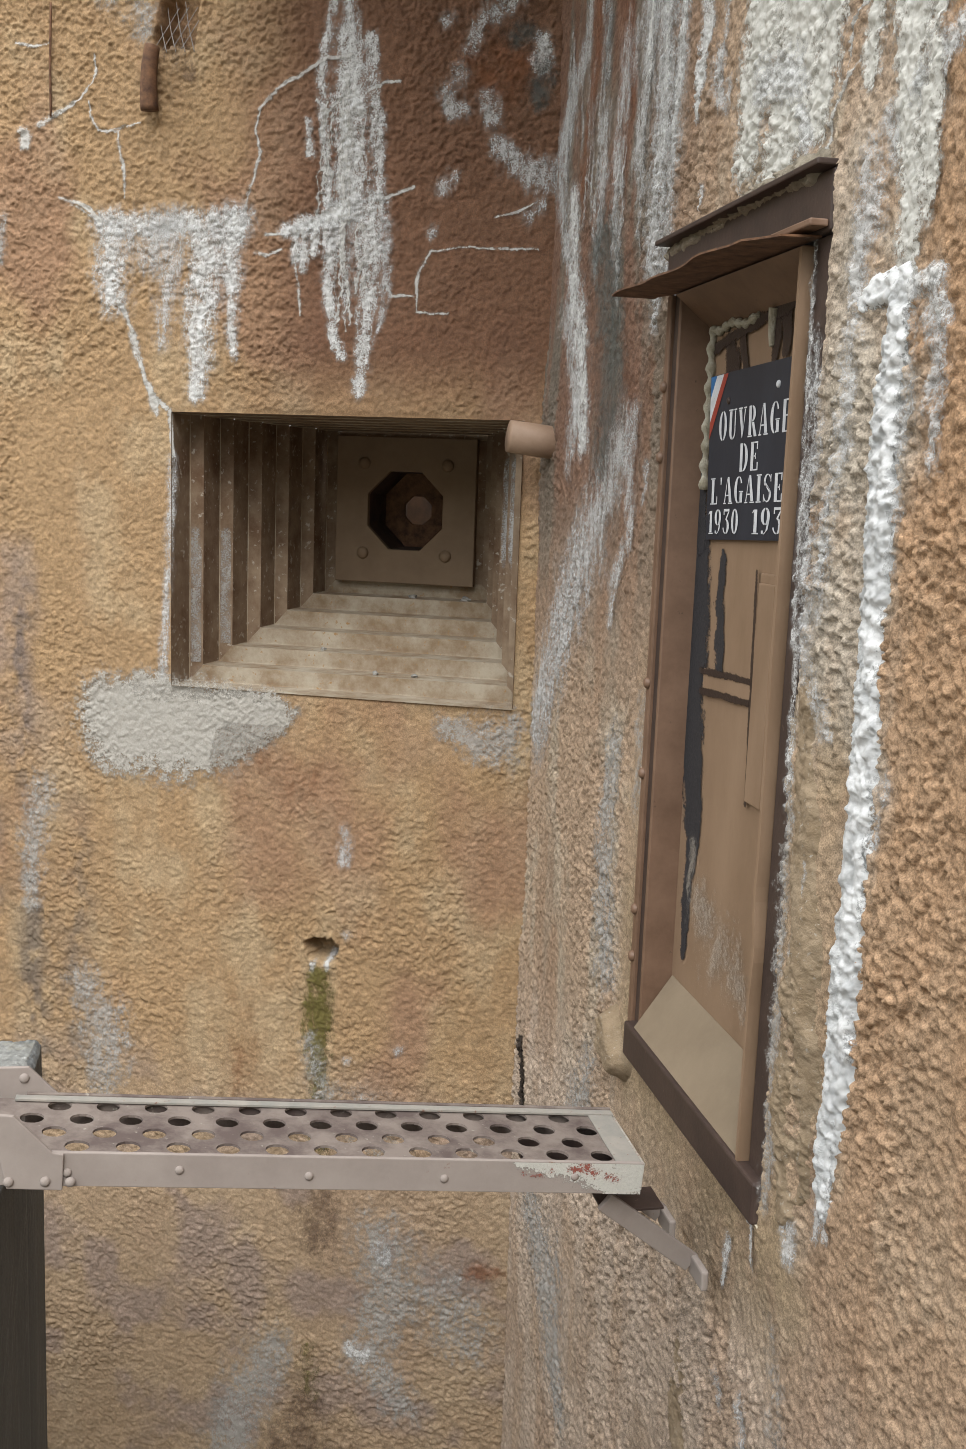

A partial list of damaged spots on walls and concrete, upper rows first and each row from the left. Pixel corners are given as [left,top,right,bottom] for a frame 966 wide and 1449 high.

peeling [74,528,301,787]
leakage [338,828,351,867]
leakage [300,934,377,1101]
leakage [339,1209,492,1422]